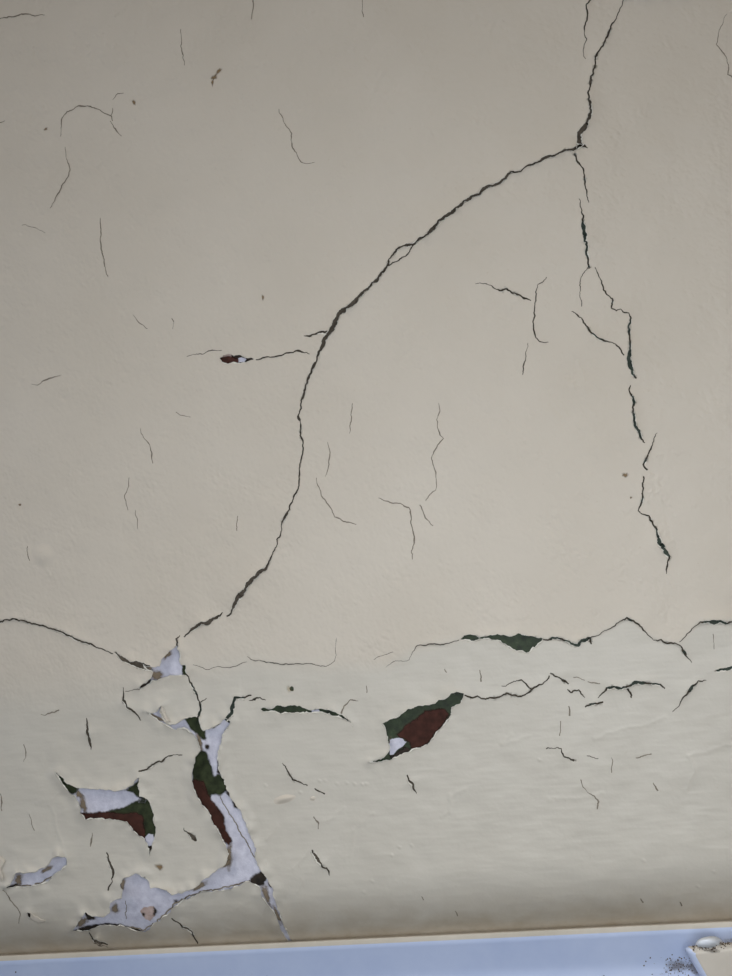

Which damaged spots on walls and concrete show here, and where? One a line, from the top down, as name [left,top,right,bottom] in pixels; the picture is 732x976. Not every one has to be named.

crack [716,14,732,77]
crack [50,93,123,208]
crack [100,218,108,276]
peeling [220,353,254,364]
crack [175,0,671,646]
peeling [138,646,187,689]
crack [224,694,265,723]
crack [186,647,336,718]
peeling [369,692,464,763]
peeling [461,633,543,653]
peeling [55,772,156,856]
peeling [73,706,291,941]